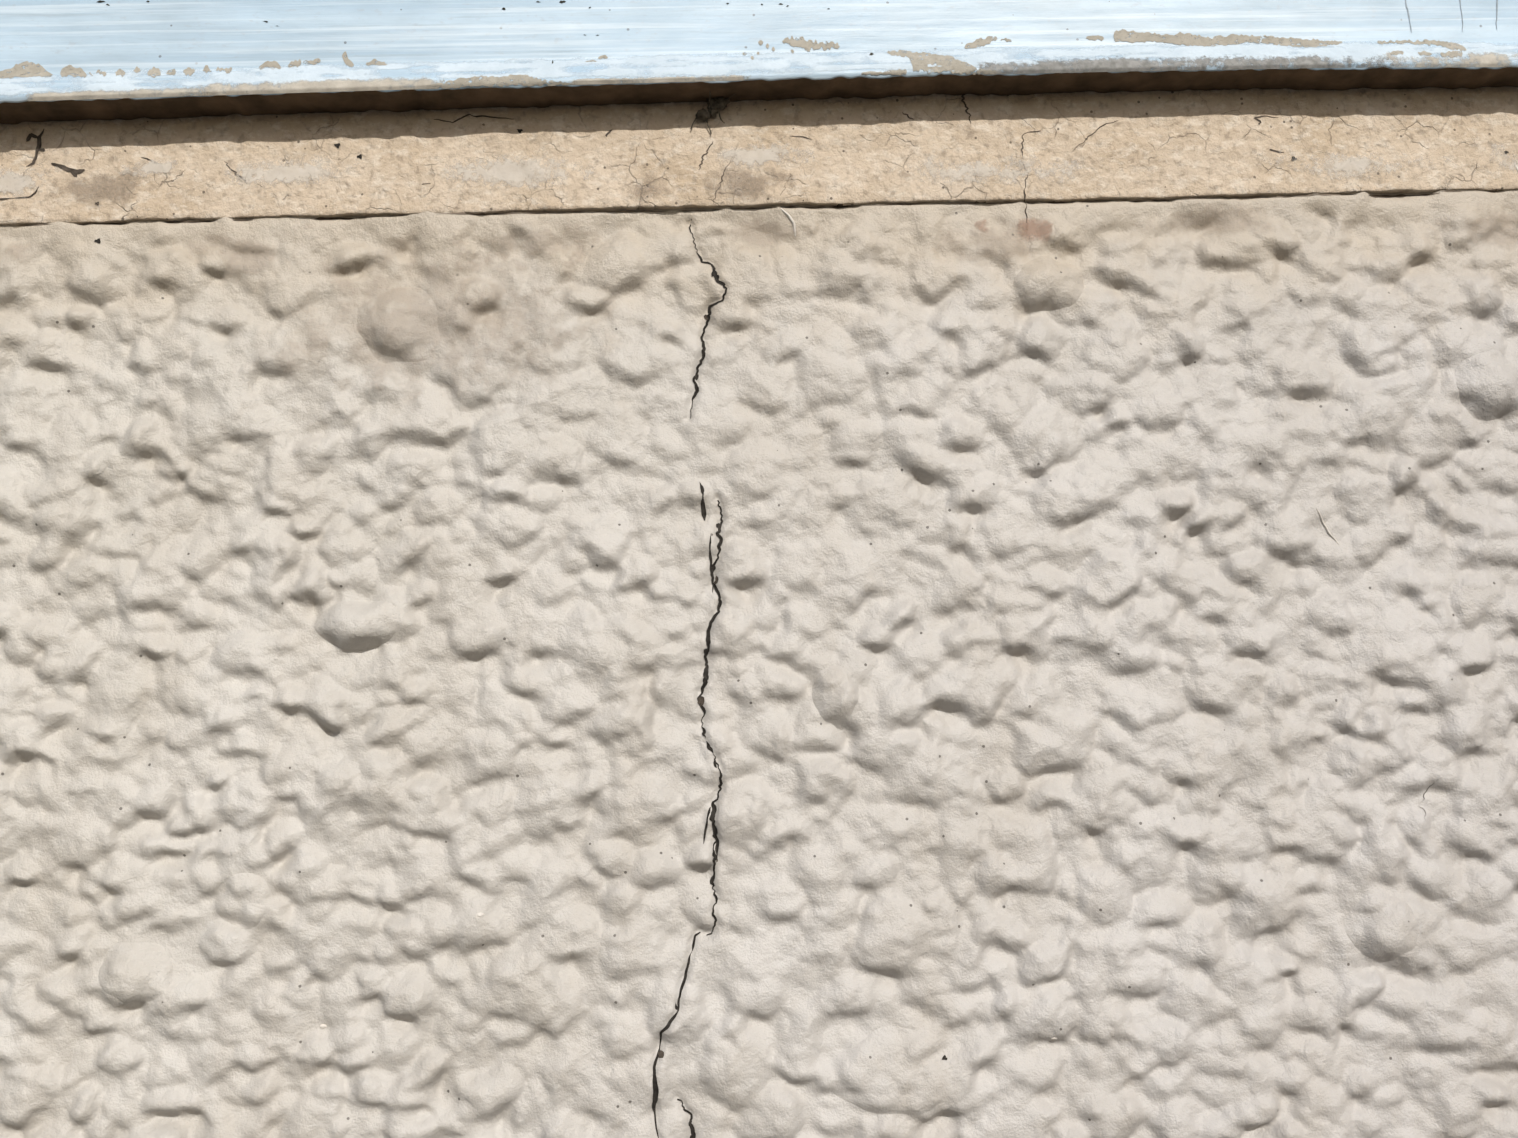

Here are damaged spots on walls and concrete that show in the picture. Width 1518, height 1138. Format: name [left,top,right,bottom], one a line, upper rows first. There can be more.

peeling [1086,29,1342,47]
peeling [0,61,232,78]
peeling [259,58,321,70]
peeling [342,51,387,67]
peeling [742,36,840,60]
peeling [861,36,1011,76]
peeling [1377,39,1466,58]
peeling [426,74,577,89]
crack [652,483,723,1138]